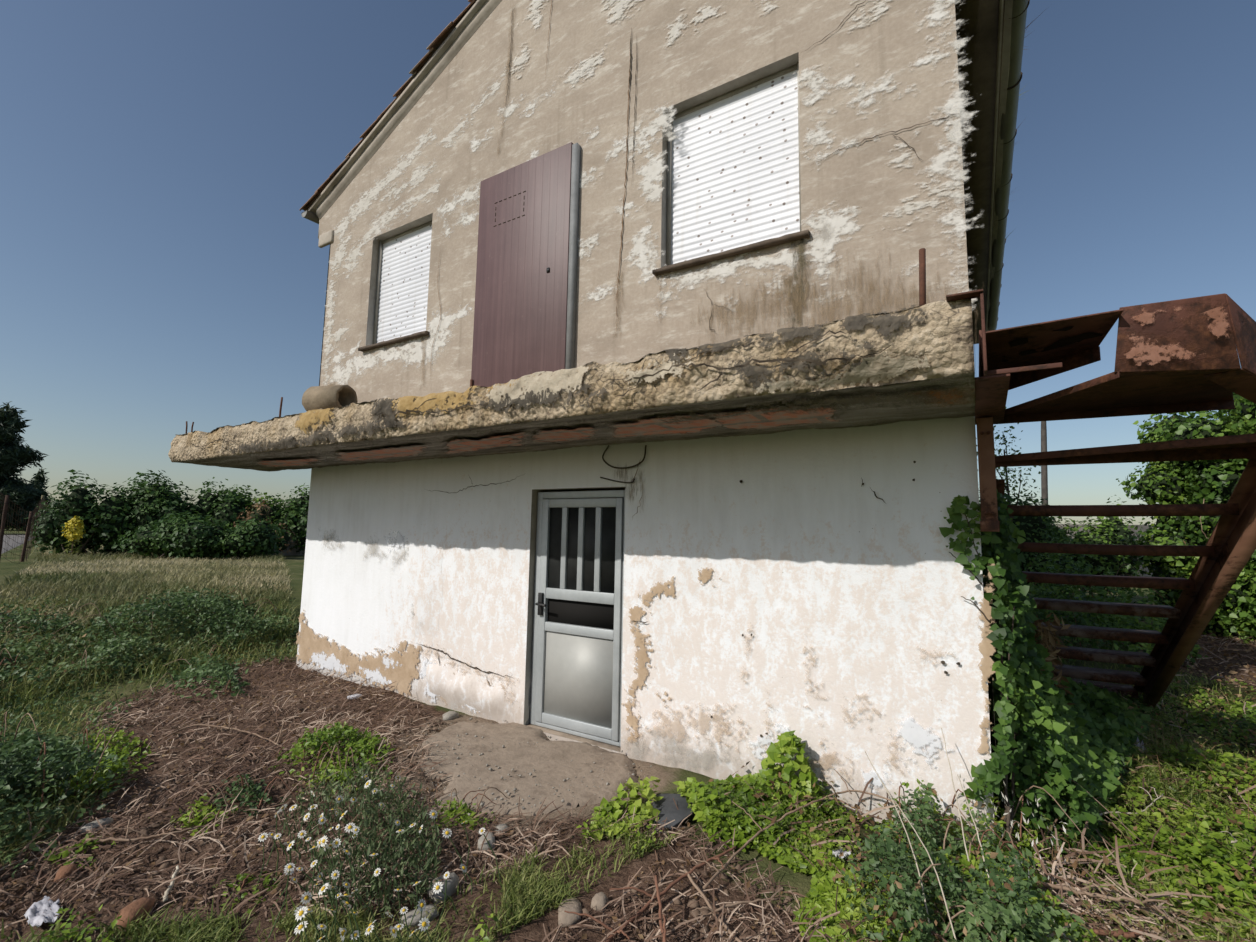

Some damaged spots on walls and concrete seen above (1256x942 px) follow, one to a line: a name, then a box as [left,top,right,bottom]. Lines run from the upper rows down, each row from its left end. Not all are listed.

peeling [321,46,604,385]
crack [616,28,637,329]
peeling [606,105,676,216]
peeling [626,203,860,315]
peeling [883,0,977,308]
spalling [486,366,589,407]
flaking render [444,405,839,454]
spalling [618,351,694,390]
spalling [752,351,930,395]
flaking render [296,610,512,713]
crack [420,644,510,685]
flaking render [621,576,789,759]